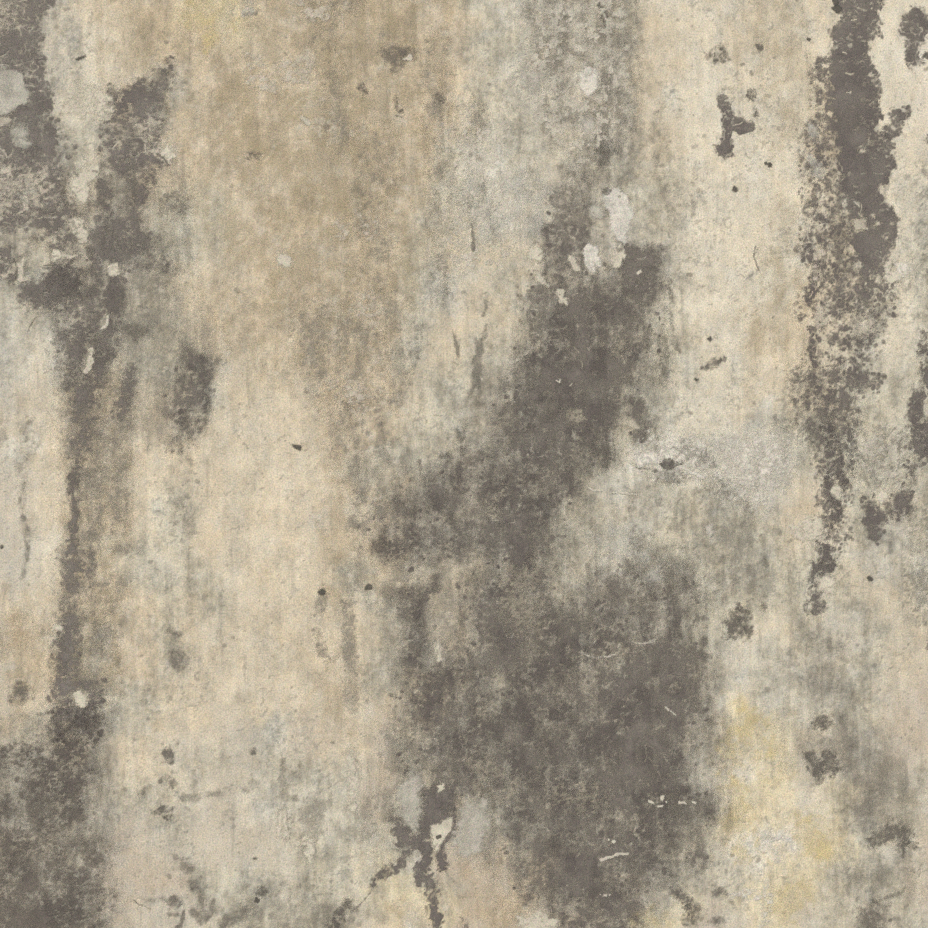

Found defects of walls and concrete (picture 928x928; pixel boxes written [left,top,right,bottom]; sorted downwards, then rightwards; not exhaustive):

damp [0,0,177,928]
damp [164,350,215,445]
damp [350,185,796,928]
damp [716,94,754,158]
damp [793,0,928,615]